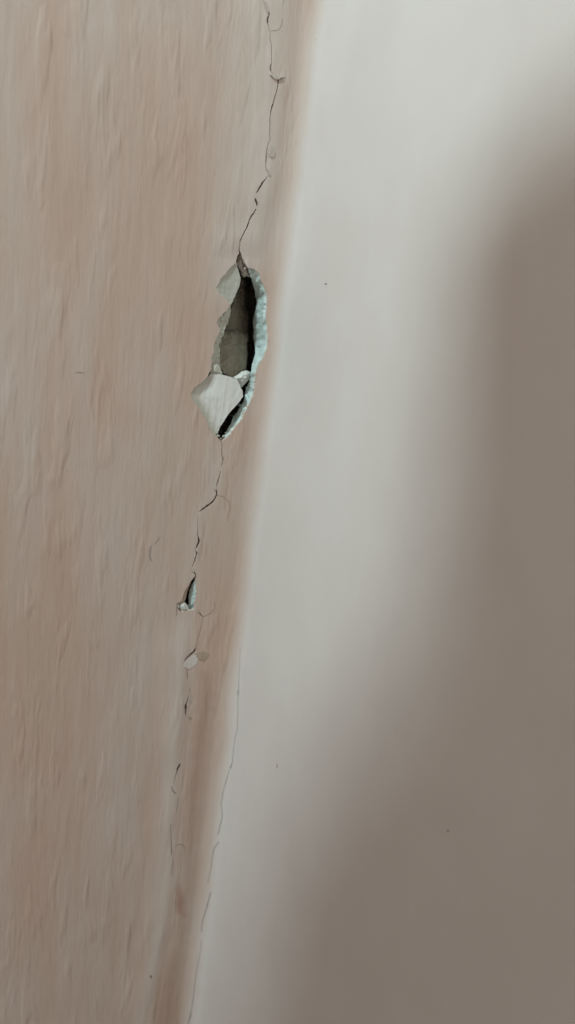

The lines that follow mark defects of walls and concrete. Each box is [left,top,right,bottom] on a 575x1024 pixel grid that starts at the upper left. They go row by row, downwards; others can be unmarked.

flaking render [190,254,268,440]
crack [201,484,231,520]
flaking render [176,577,196,616]
crack [184,602,215,720]
crack [188,648,241,1024]